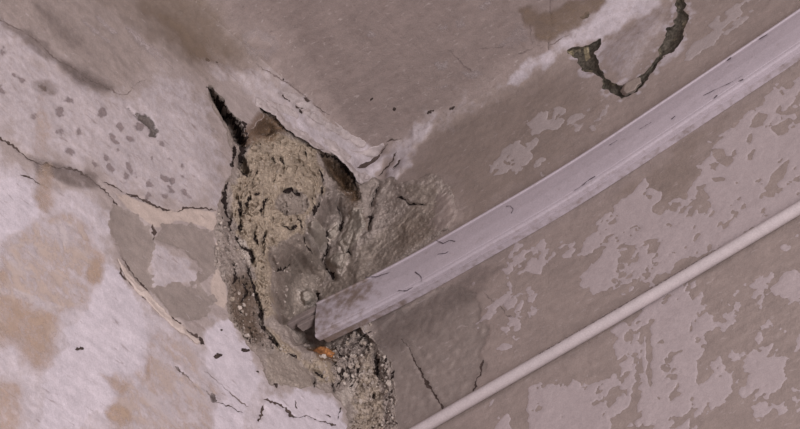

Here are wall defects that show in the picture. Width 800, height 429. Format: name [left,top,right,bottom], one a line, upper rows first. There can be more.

crack [0,137,213,240]
crack [119,260,148,299]
flaking render [117,258,205,345]
spalling [207,85,457,429]
peeling [476,77,800,351]
crack [175,366,336,426]
crack [401,339,444,409]
peeling [495,414,511,429]
peeling [526,269,800,429]